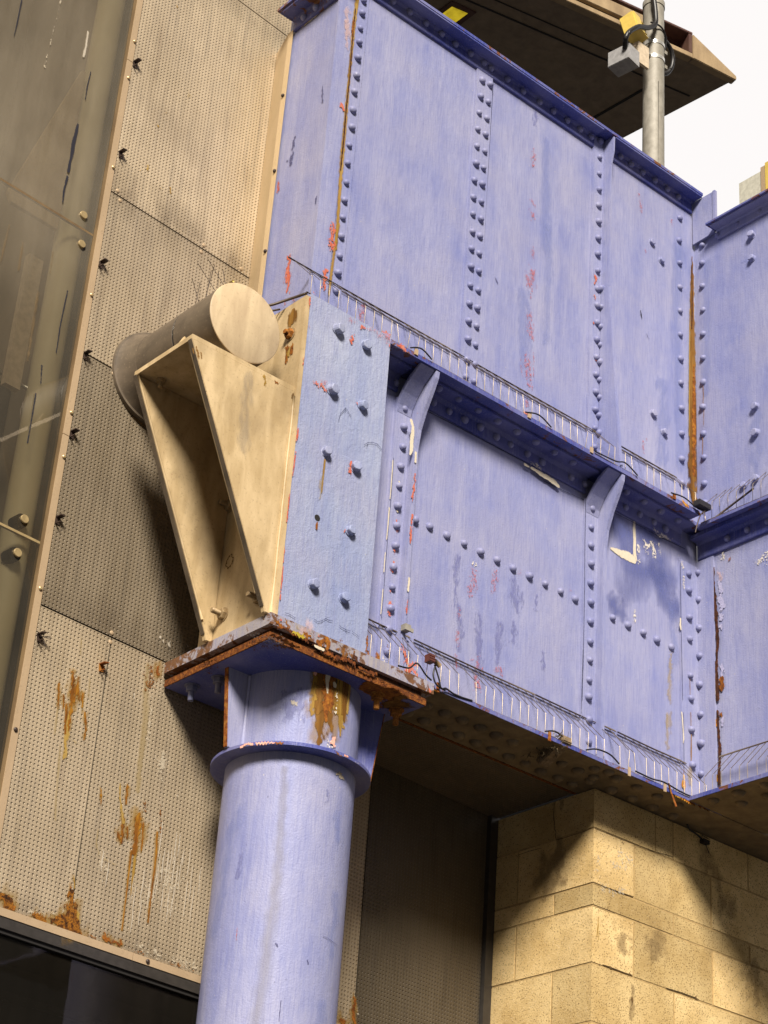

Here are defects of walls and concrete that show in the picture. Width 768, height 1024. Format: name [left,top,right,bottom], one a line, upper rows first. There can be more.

corrosion [245,620,412,746]